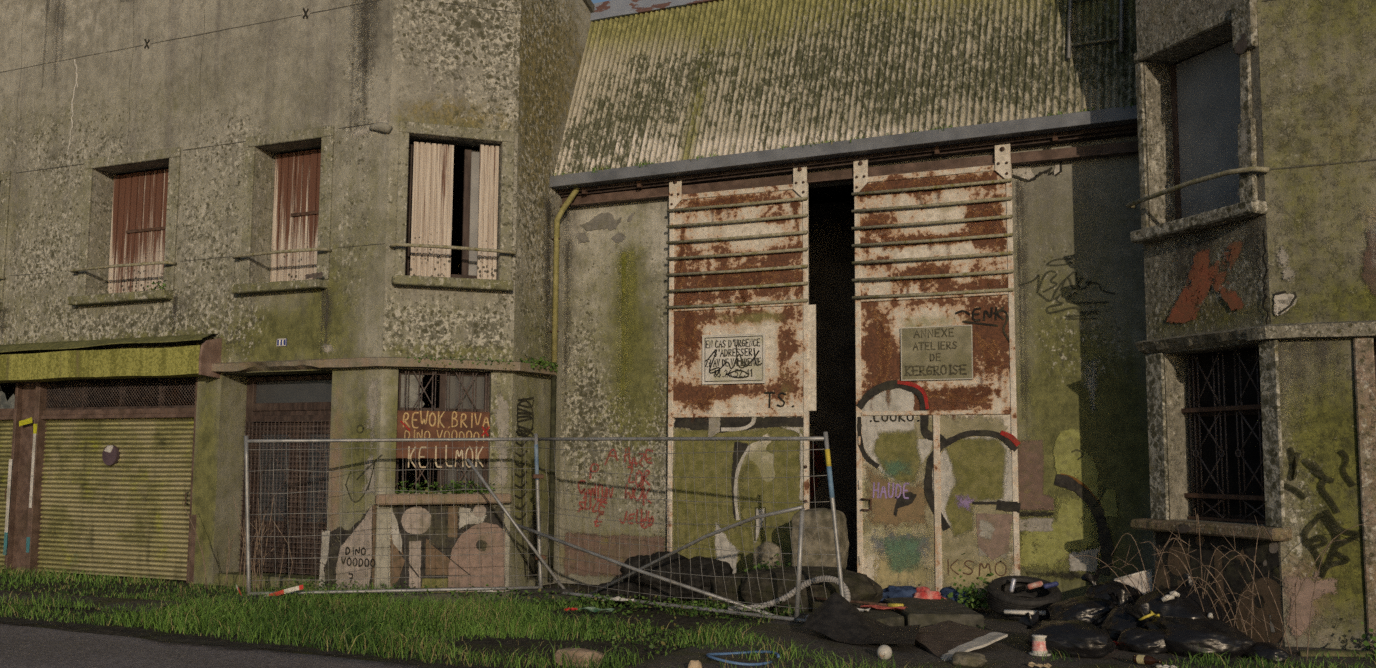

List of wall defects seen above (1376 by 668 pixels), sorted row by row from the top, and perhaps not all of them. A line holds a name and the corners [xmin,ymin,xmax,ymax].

rust [678,194,754,217]
rust [790,201,803,246]
rust [861,194,1007,257]
rust [913,172,988,204]
rust [673,223,803,360]
rust [898,265,936,293]
rust [681,388,720,412]
rust [869,308,892,403]
rust [922,333,1006,417]
flaking render [1283,570,1337,636]